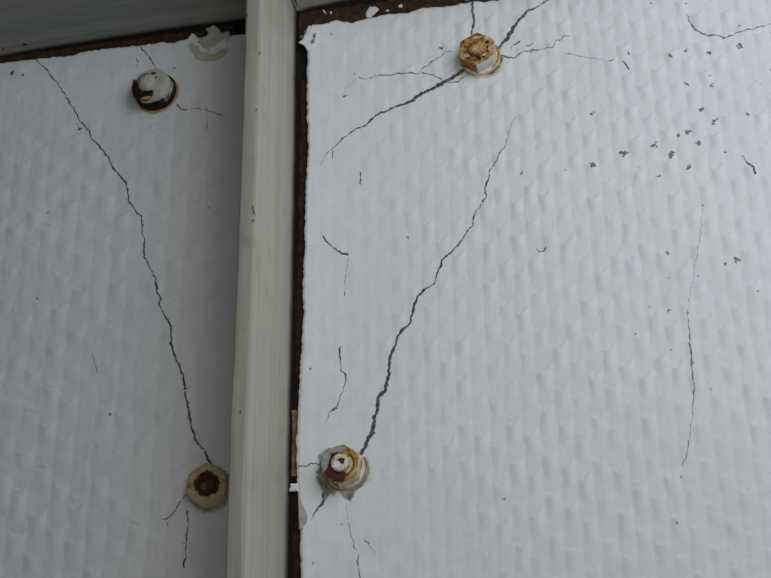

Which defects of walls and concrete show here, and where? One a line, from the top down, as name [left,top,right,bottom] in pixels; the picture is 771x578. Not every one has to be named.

peeling [198,25,230,51]
crack [469,0,477,35]
rust [464,40,503,77]
crack [498,0,629,69]
crack [686,14,771,40]
rust [132,72,178,114]
crack [320,50,468,165]
crack [36,59,213,464]
crack [359,116,516,455]
crack [682,293,695,466]
rust [194,470,228,513]
rust [324,453,369,490]